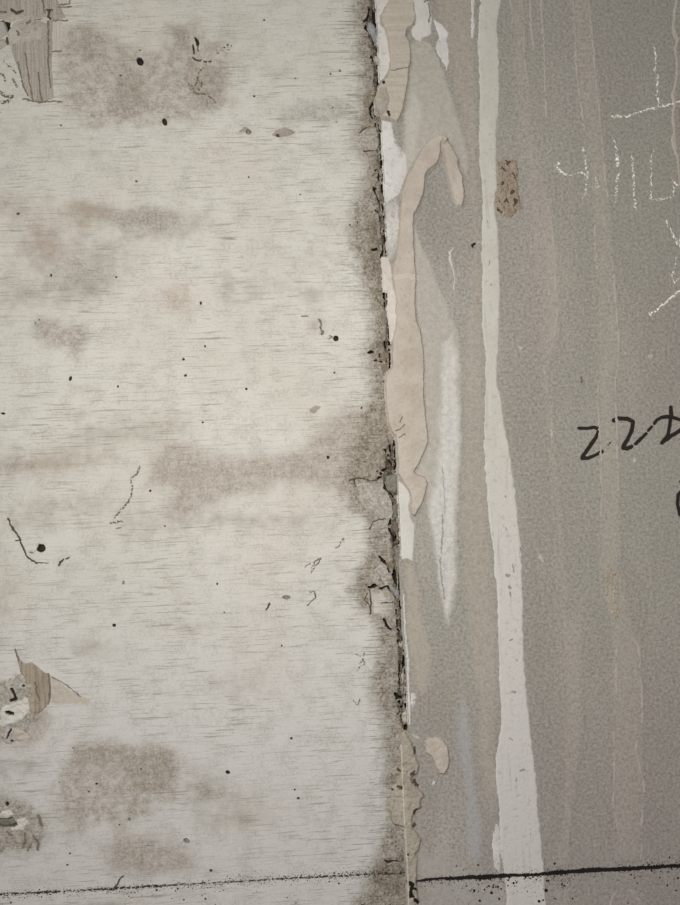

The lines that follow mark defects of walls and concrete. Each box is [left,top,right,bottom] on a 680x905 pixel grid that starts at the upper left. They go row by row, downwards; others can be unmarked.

spalling [0,8,52,122]
water stain [50,13,255,143]
water stain [132,0,464,905]
spalling [0,648,92,745]
spalling [0,796,45,853]
water stain [0,702,211,905]
crack [384,857,404,865]
water stain [452,678,486,863]